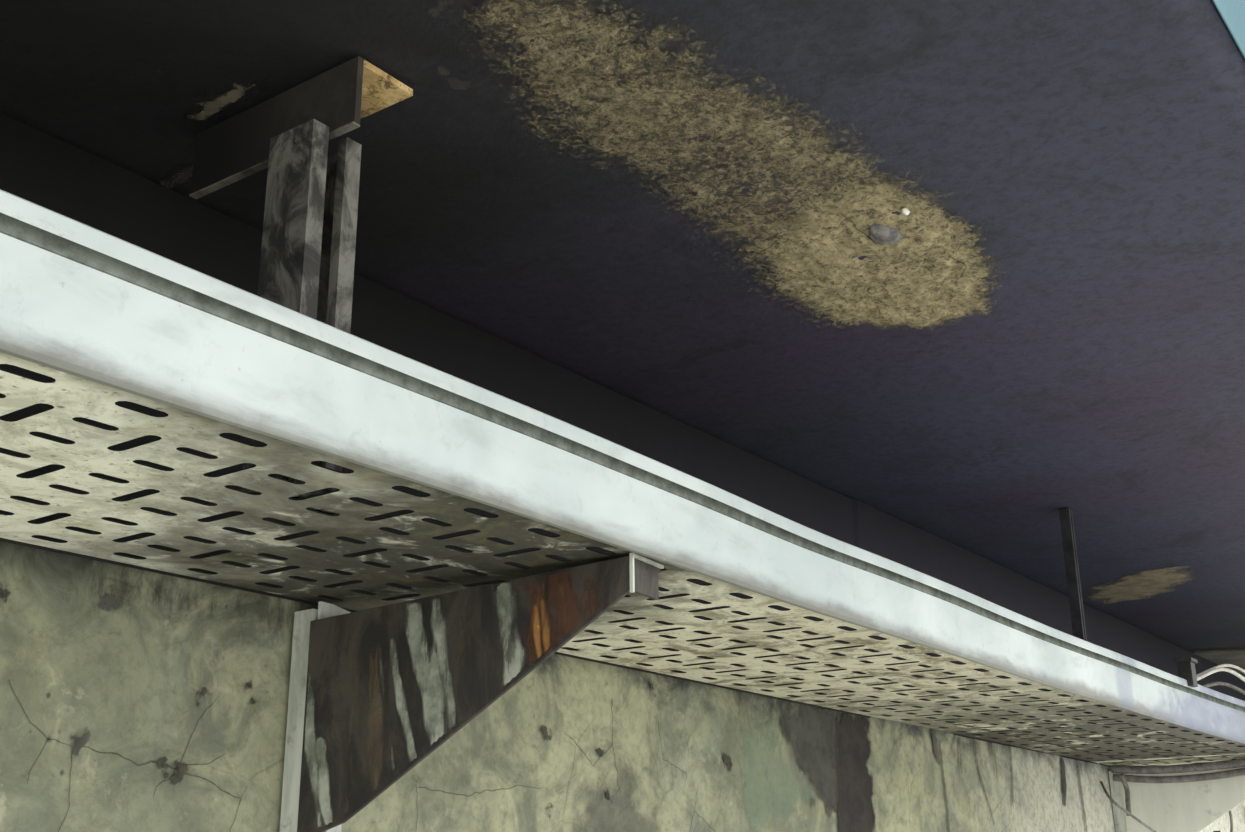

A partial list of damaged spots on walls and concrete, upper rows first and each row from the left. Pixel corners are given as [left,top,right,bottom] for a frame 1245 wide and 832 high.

spalling [471,0,1002,335]
spalling [1089,566,1191,604]
water stain [781,704,875,832]